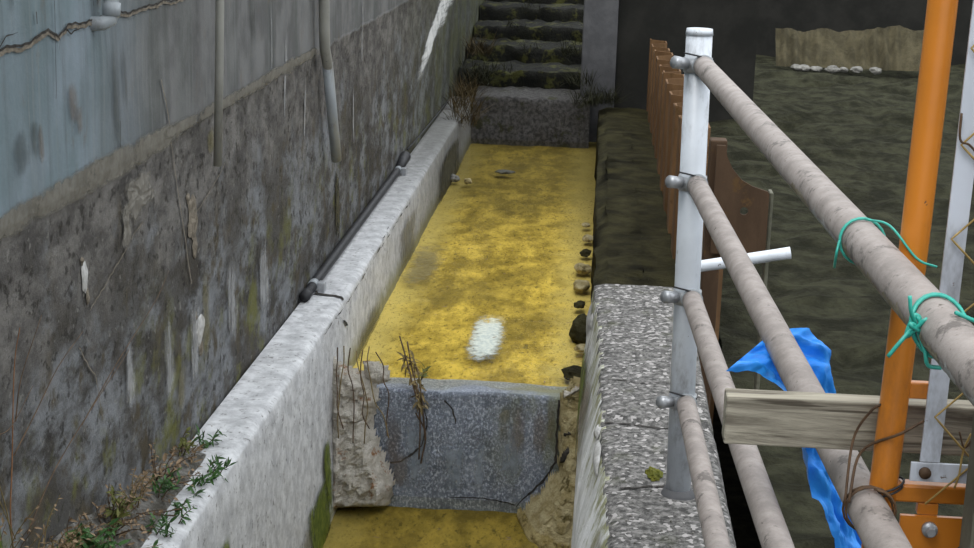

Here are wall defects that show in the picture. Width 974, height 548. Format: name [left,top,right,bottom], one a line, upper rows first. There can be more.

crack [0,0,183,63]
water stain [228,273,236,329]
water stain [260,250,268,303]
spalling [332,356,396,508]
water stain [310,442,332,548]